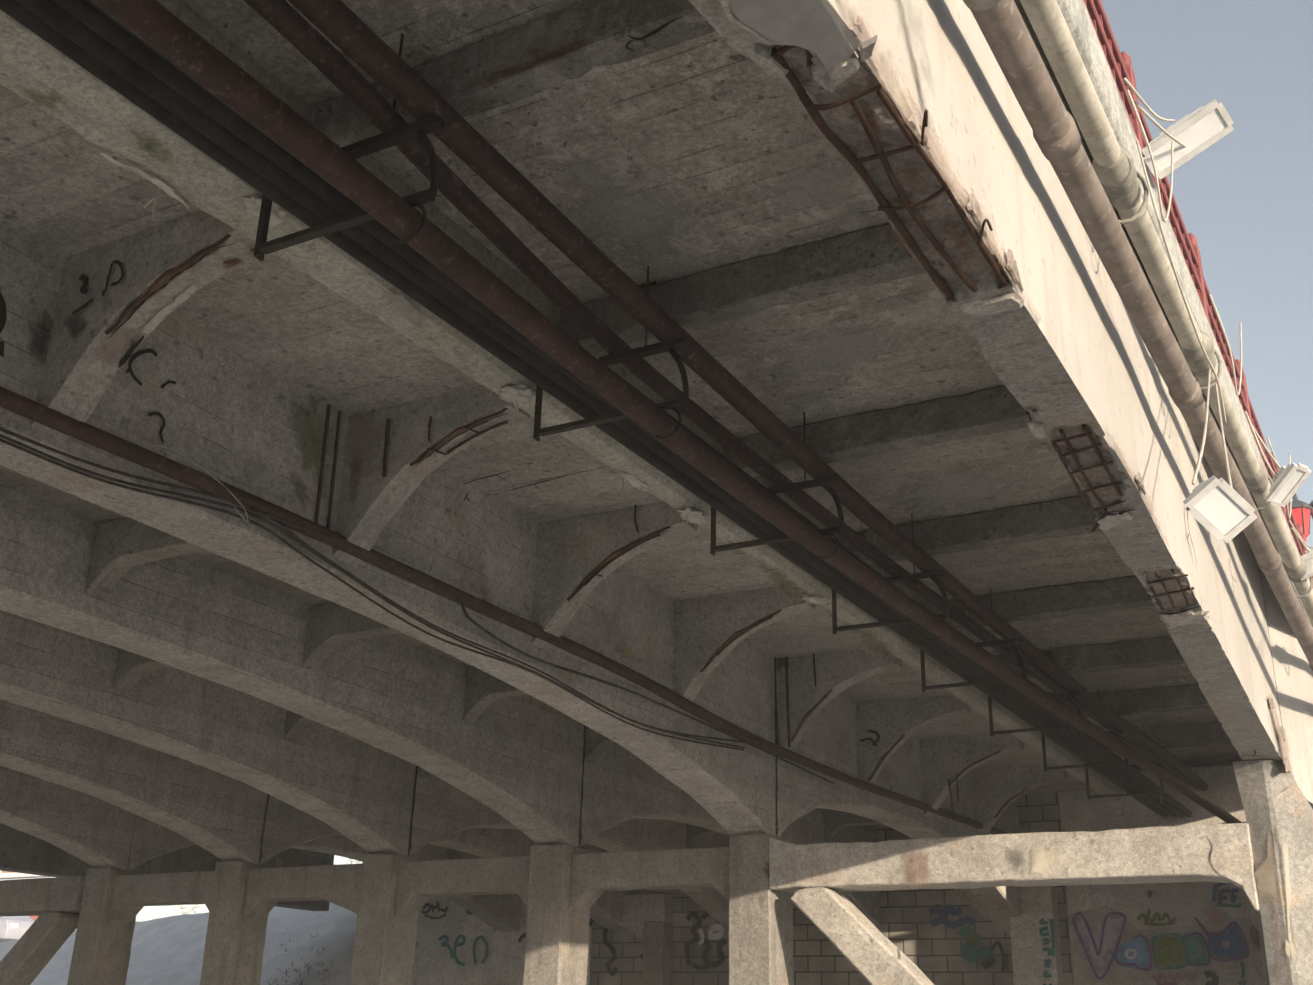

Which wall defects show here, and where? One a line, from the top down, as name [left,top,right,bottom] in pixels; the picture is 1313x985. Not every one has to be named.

spalling [719,0,1025,317]
spalling [1028,423,1160,532]
spalling [1139,568,1212,629]